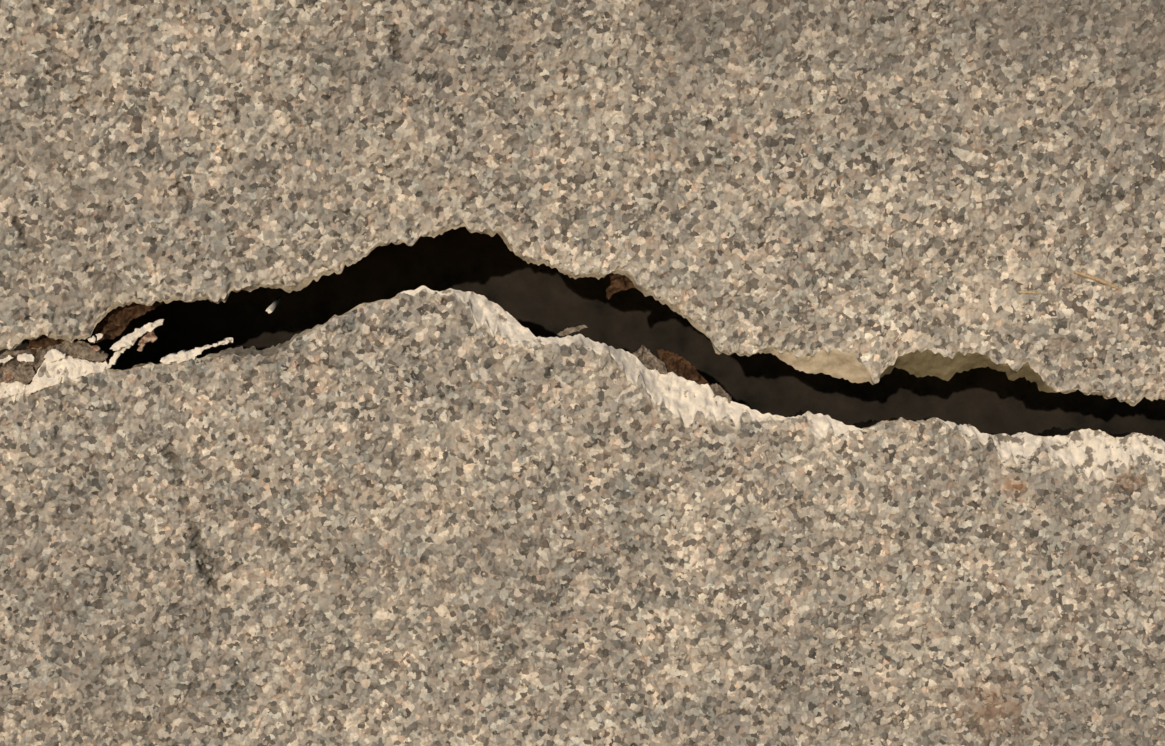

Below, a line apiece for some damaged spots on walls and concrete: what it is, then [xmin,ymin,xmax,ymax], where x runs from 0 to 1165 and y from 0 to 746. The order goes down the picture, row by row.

crack [0,223,1165,442]